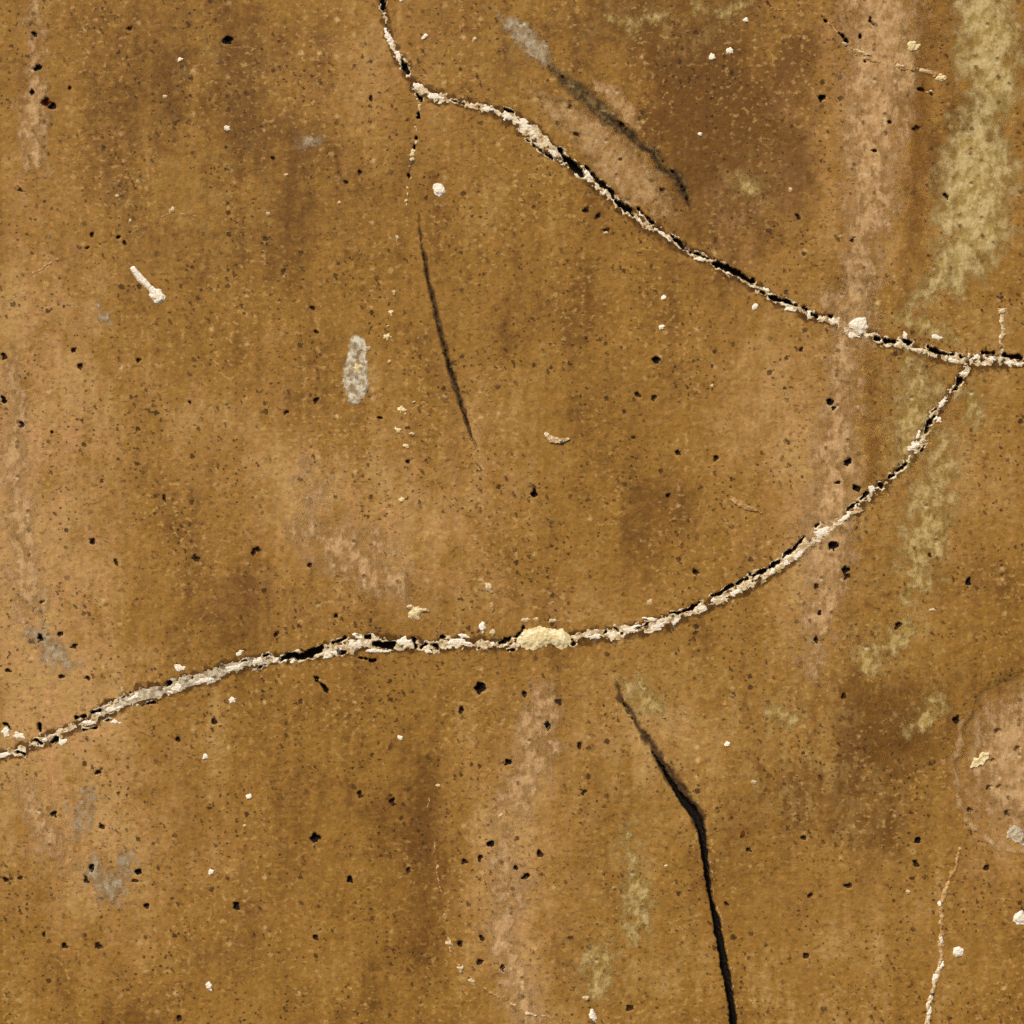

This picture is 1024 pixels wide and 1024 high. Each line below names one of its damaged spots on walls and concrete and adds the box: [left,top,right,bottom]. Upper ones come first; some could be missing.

water stain [895,0,1024,341]
crack [0,0,1024,760]
water stain [885,348,984,606]
crack [616,683,738,1024]
crack [924,847,962,1024]